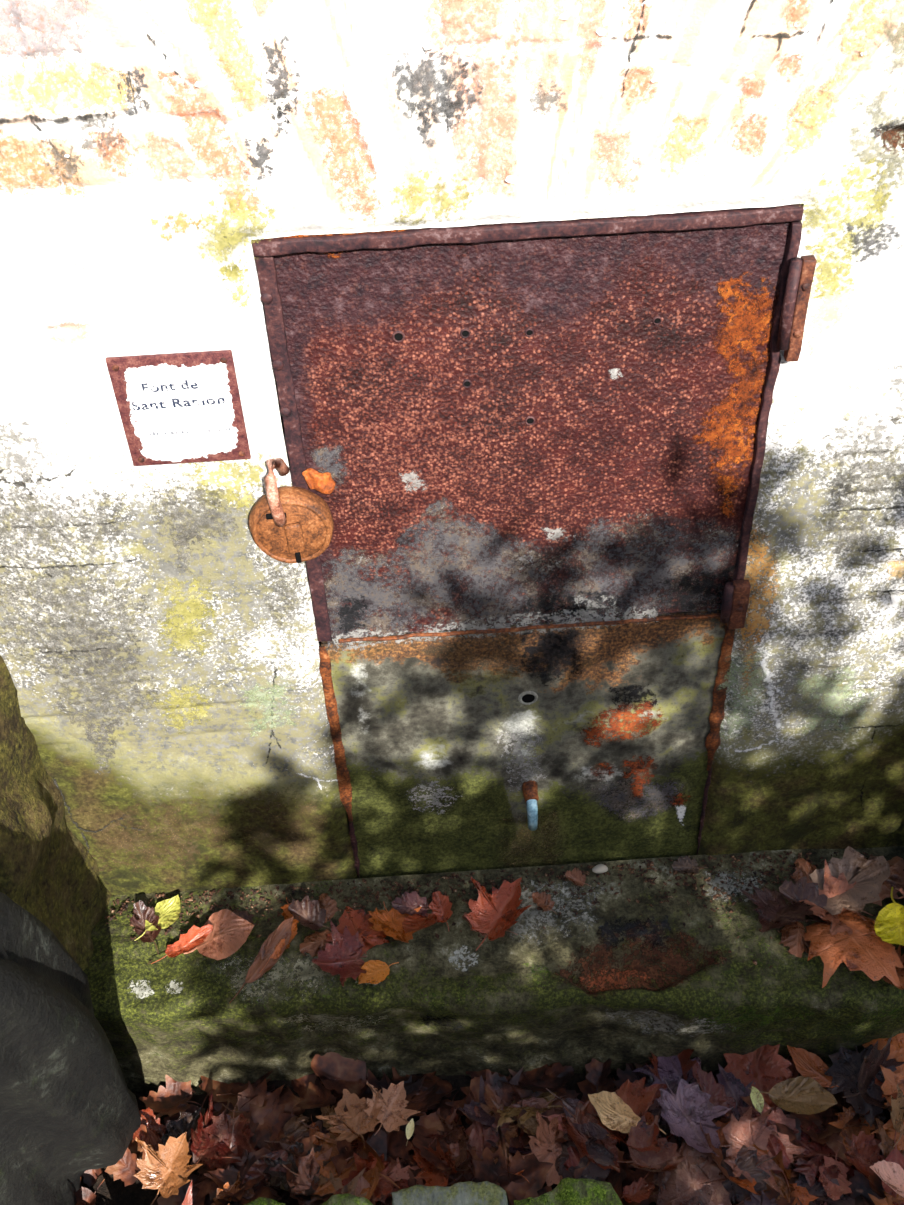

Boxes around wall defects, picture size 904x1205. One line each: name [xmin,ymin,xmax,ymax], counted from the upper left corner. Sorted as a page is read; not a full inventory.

mould [392,49,484,146]
rust [265,229,404,240]
rust [694,273,780,518]
damp [821,374,904,554]
damp [150,487,238,574]
damp [0,422,159,774]
damp [257,555,310,625]
rust [737,528,781,694]
rust [581,701,666,748]
efflorescence [735,649,784,752]
rust [590,755,655,799]